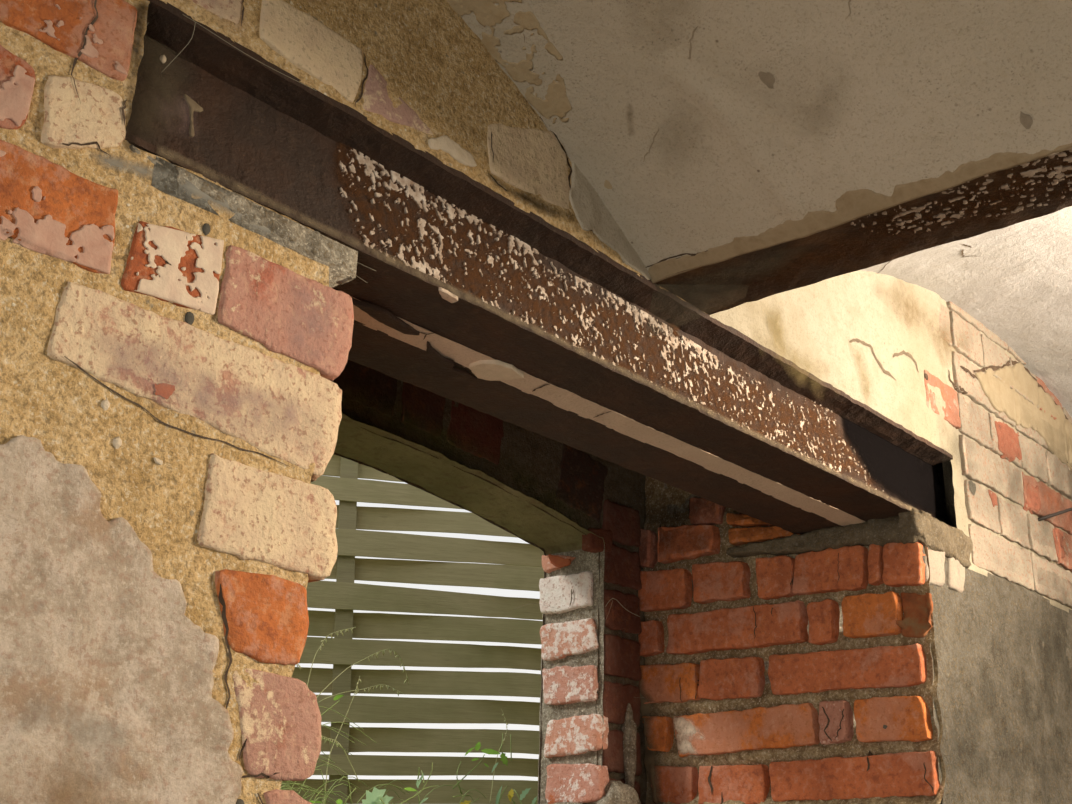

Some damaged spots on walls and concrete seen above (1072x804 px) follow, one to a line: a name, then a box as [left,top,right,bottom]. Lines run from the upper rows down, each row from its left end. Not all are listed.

peeling [0,65,35,126]
crack [71,0,98,104]
peeling [79,17,103,58]
flaking render [446,0,572,124]
peeling [0,207,114,274]
peeling [131,223,224,315]
rust [438,287,458,303]
rust [352,298,477,380]
crack [849,338,919,380]
flaking render [0,435,243,804]
crack [218,584,232,709]
crack [239,739,278,804]